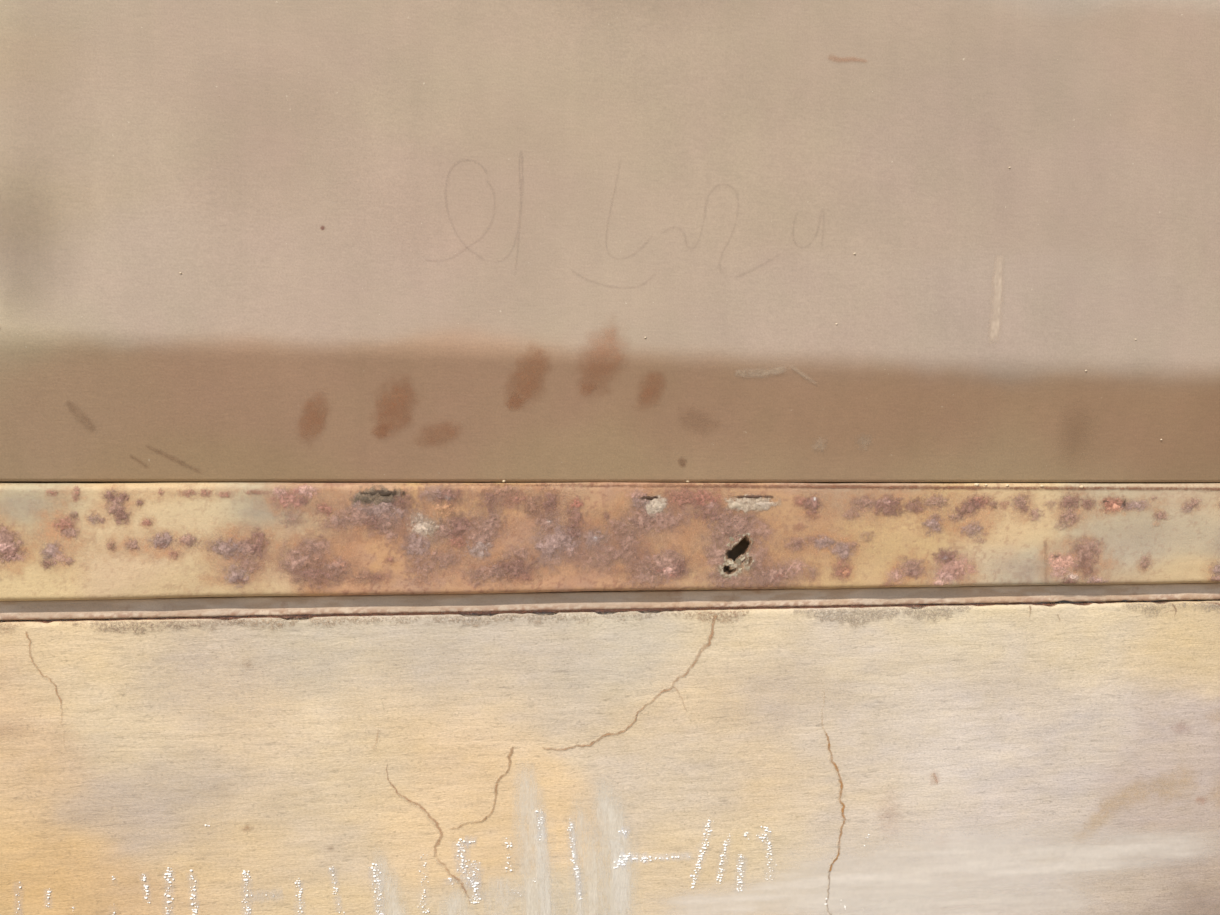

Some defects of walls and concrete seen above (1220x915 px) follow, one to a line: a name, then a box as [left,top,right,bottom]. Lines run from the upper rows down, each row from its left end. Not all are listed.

corrosion [0,525,26,566]
corrosion [38,488,196,568]
corrosion [212,486,502,588]
corrosion [528,484,587,565]
corrosion [583,484,1220,587]
crack [548,615,717,750]
crack [386,749,513,846]
damp [571,796,631,915]
crack [826,734,845,906]